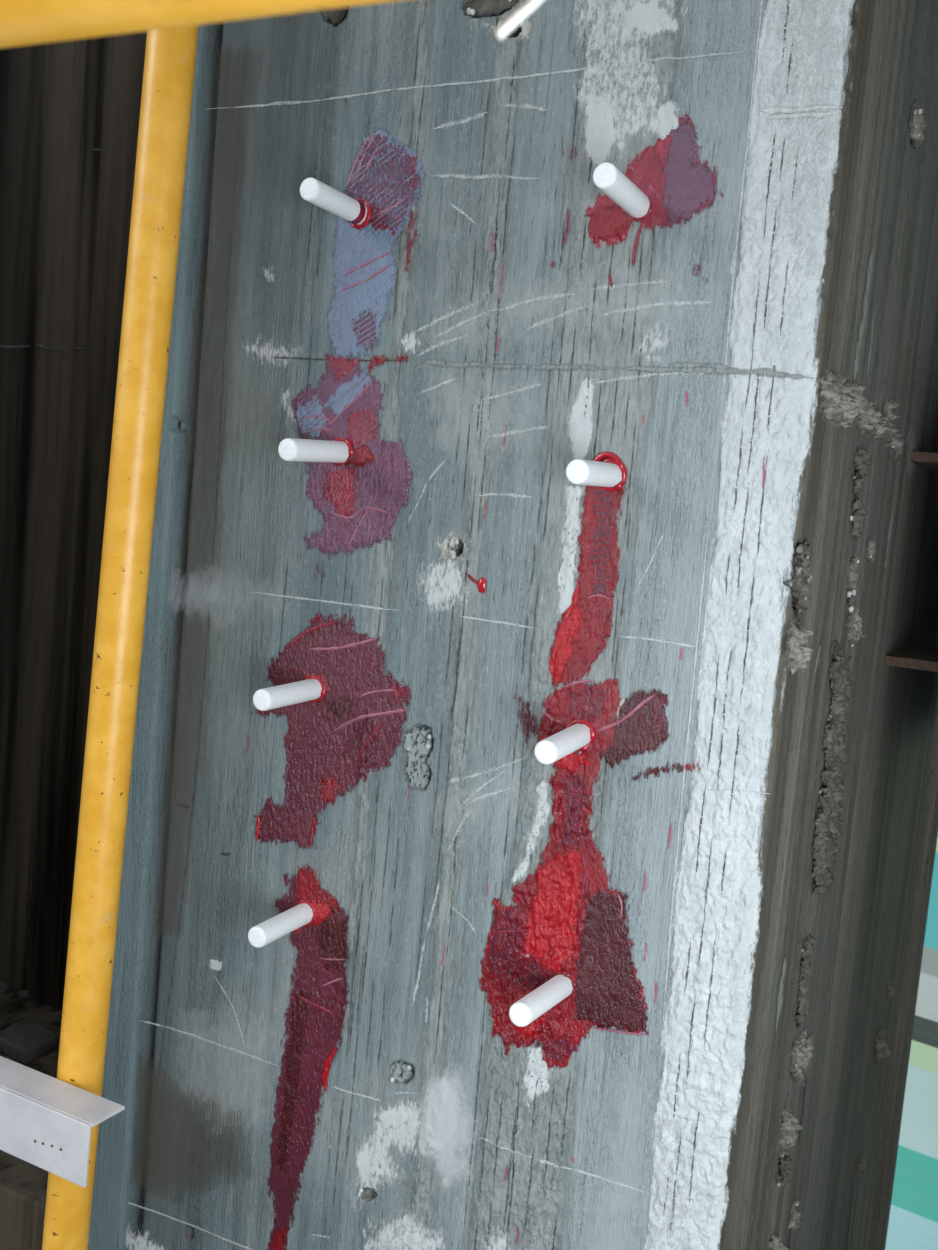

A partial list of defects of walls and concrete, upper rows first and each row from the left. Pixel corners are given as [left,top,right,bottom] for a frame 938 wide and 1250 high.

spalling [783,538,817,674]
spalling [810,445,876,894]
spalling [403,727,433,790]
spalling [790,935,815,1086]
damp [351,1079,467,1207]
spalling [775,1105,803,1188]
damp [363,1210,445,1250]